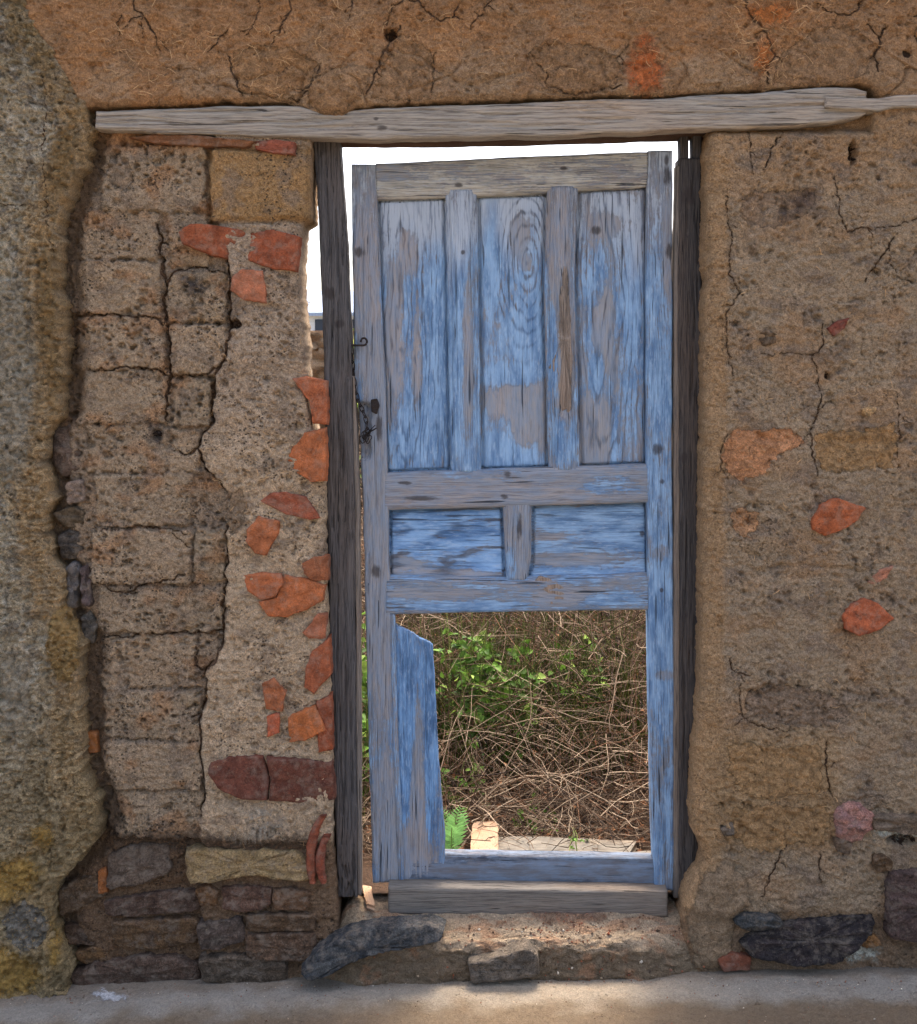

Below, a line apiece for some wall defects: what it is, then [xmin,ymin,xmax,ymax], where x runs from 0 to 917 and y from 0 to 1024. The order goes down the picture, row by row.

crack [116,0,170,52]
crack [207,0,292,96]
crack [365,0,493,95]
crack [530,45,628,96]
crack [745,0,780,84]
crack [817,0,885,72]
crack [833,177,917,284]
crack [725,189,746,376]
crack [85,224,234,489]
crack [761,324,830,476]
crack [95,524,194,549]
crack [96,526,230,817]